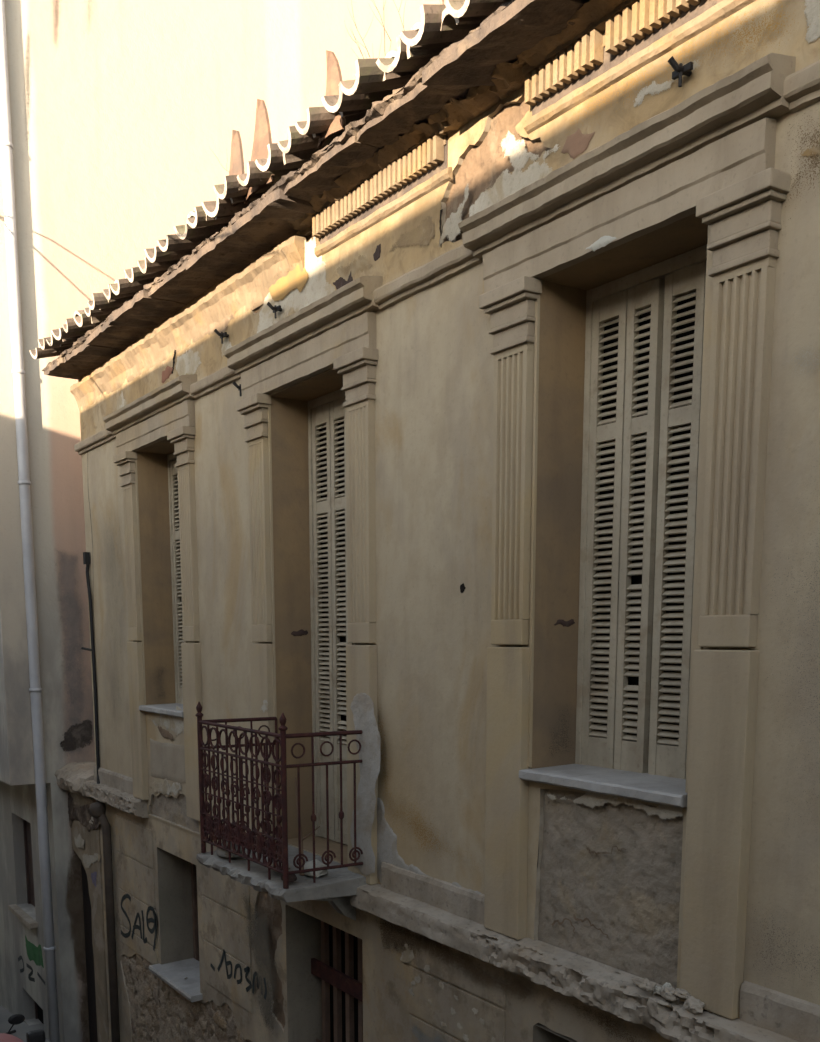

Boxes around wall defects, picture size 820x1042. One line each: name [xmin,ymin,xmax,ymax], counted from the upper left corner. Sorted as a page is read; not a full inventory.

leakage [50,0,63,46]
flaking render [254,100,595,333]
leakage [49,547,91,740]
flaking render [350,692,431,883]
flaking render [253,892,290,1028]